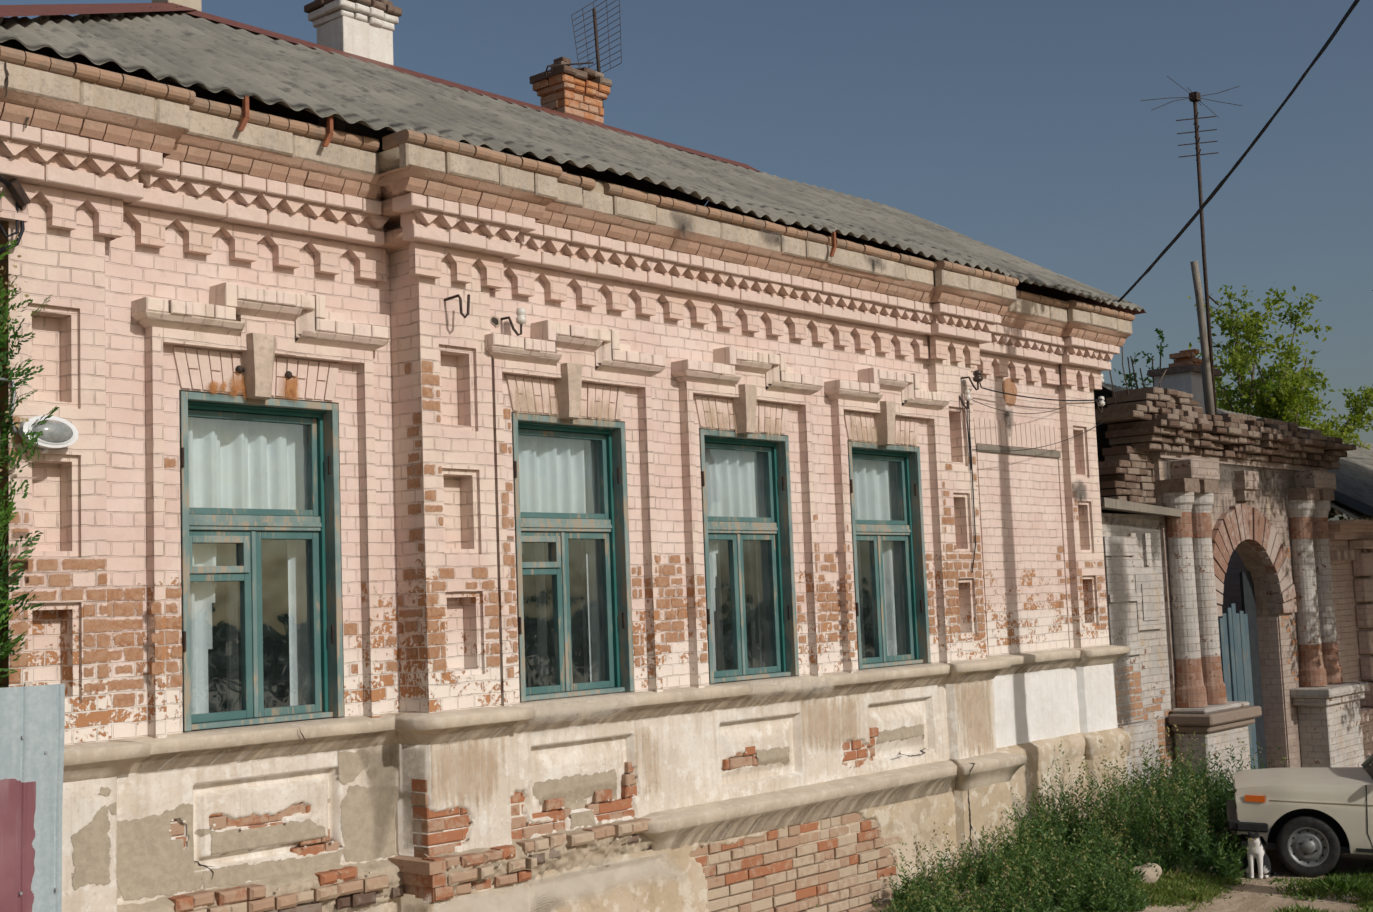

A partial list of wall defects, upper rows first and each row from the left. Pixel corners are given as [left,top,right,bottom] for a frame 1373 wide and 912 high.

peeling [9,416,28,461]
peeling [9,512,183,708]
peeling [632,555,708,667]
peeling [71,749,475,900]
peeling [499,762,640,866]
flaking render [689,812,902,912]